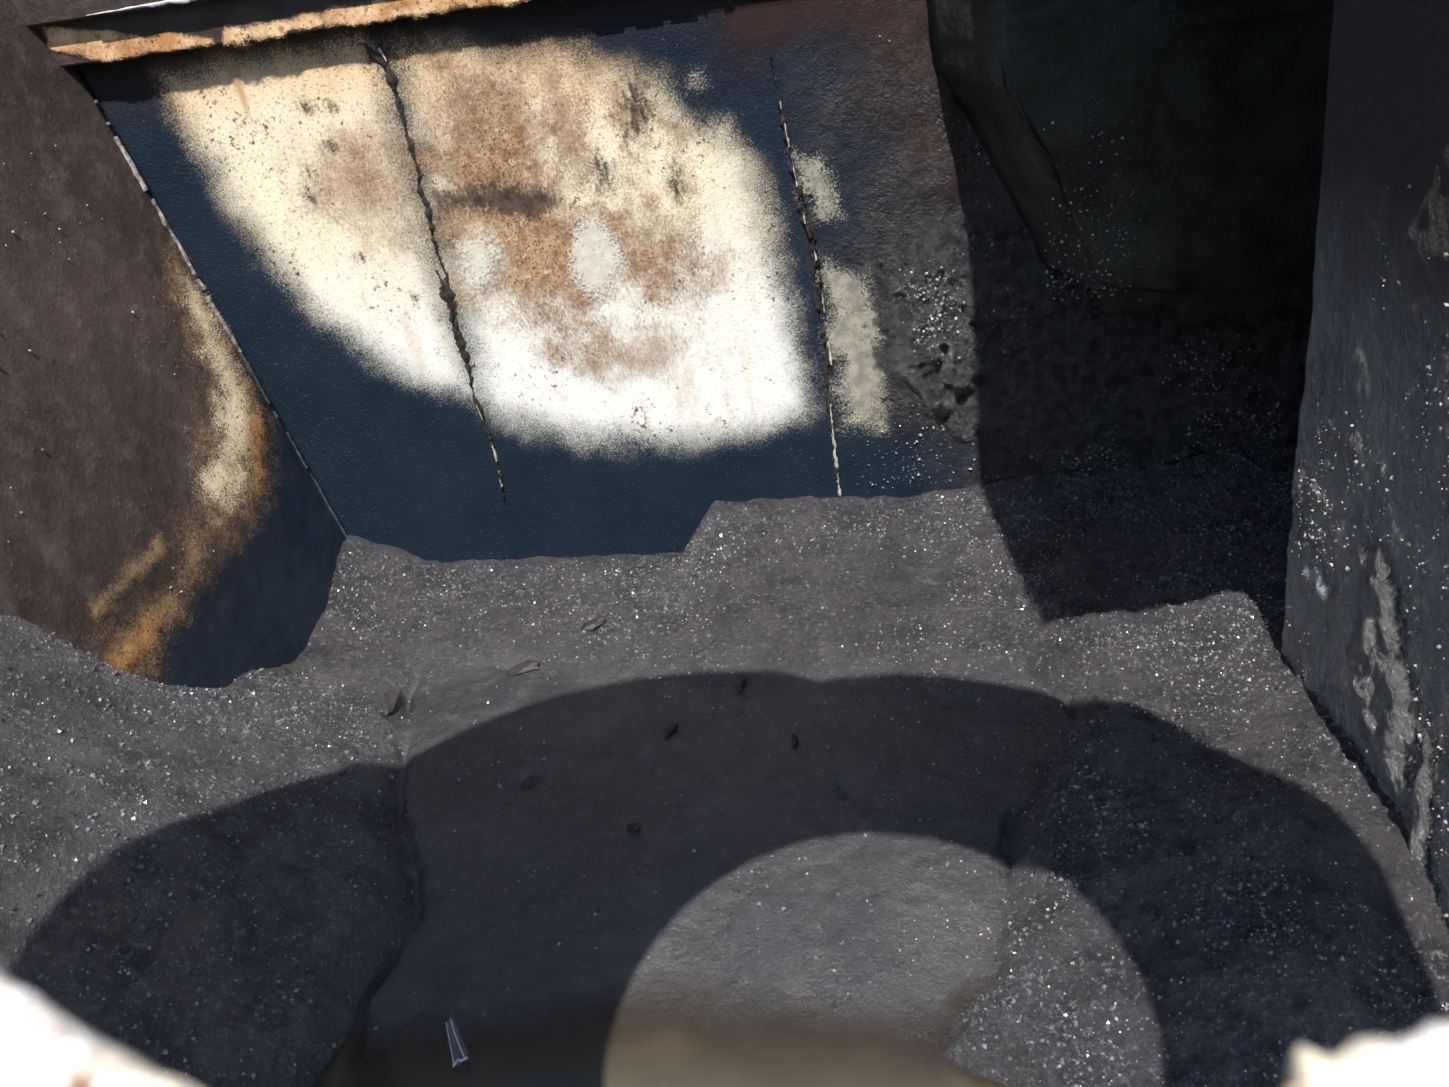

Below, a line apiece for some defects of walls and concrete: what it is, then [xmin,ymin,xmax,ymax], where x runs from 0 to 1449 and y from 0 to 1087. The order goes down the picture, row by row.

water stain [120,139,211,296]
rust [92,241,279,683]
water stain [150,311,348,688]
crack [364,43,505,502]
peeling [41,0,844,449]
water stain [430,168,561,224]
rust [302,37,727,378]
crack [769,57,841,497]